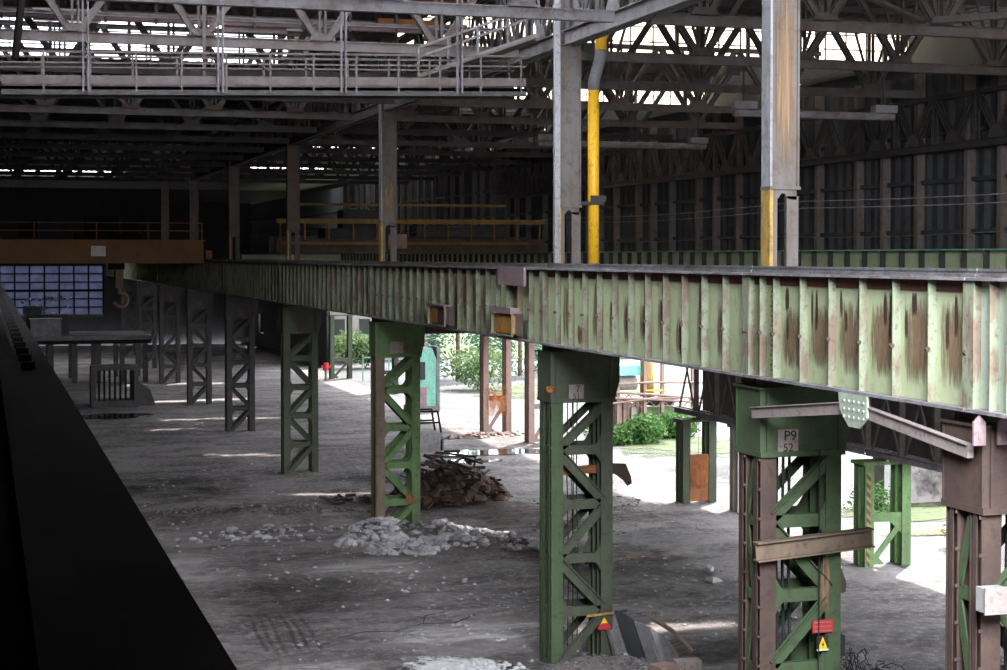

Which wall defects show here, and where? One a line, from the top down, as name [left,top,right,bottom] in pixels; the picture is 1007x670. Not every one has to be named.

rust [784,288,799,365]
rust [811,291,828,365]